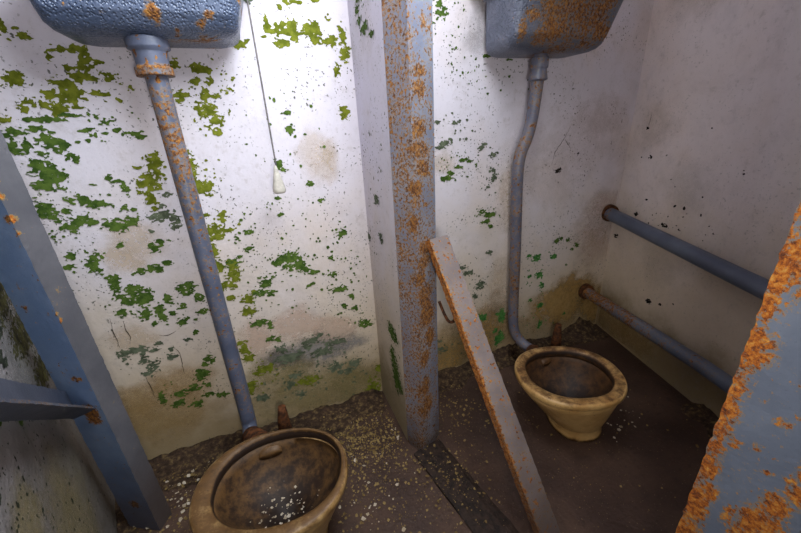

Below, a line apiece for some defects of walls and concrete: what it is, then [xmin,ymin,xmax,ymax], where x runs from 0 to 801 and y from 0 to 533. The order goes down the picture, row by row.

leakage [0,283,51,388]
leakage [259,312,371,408]